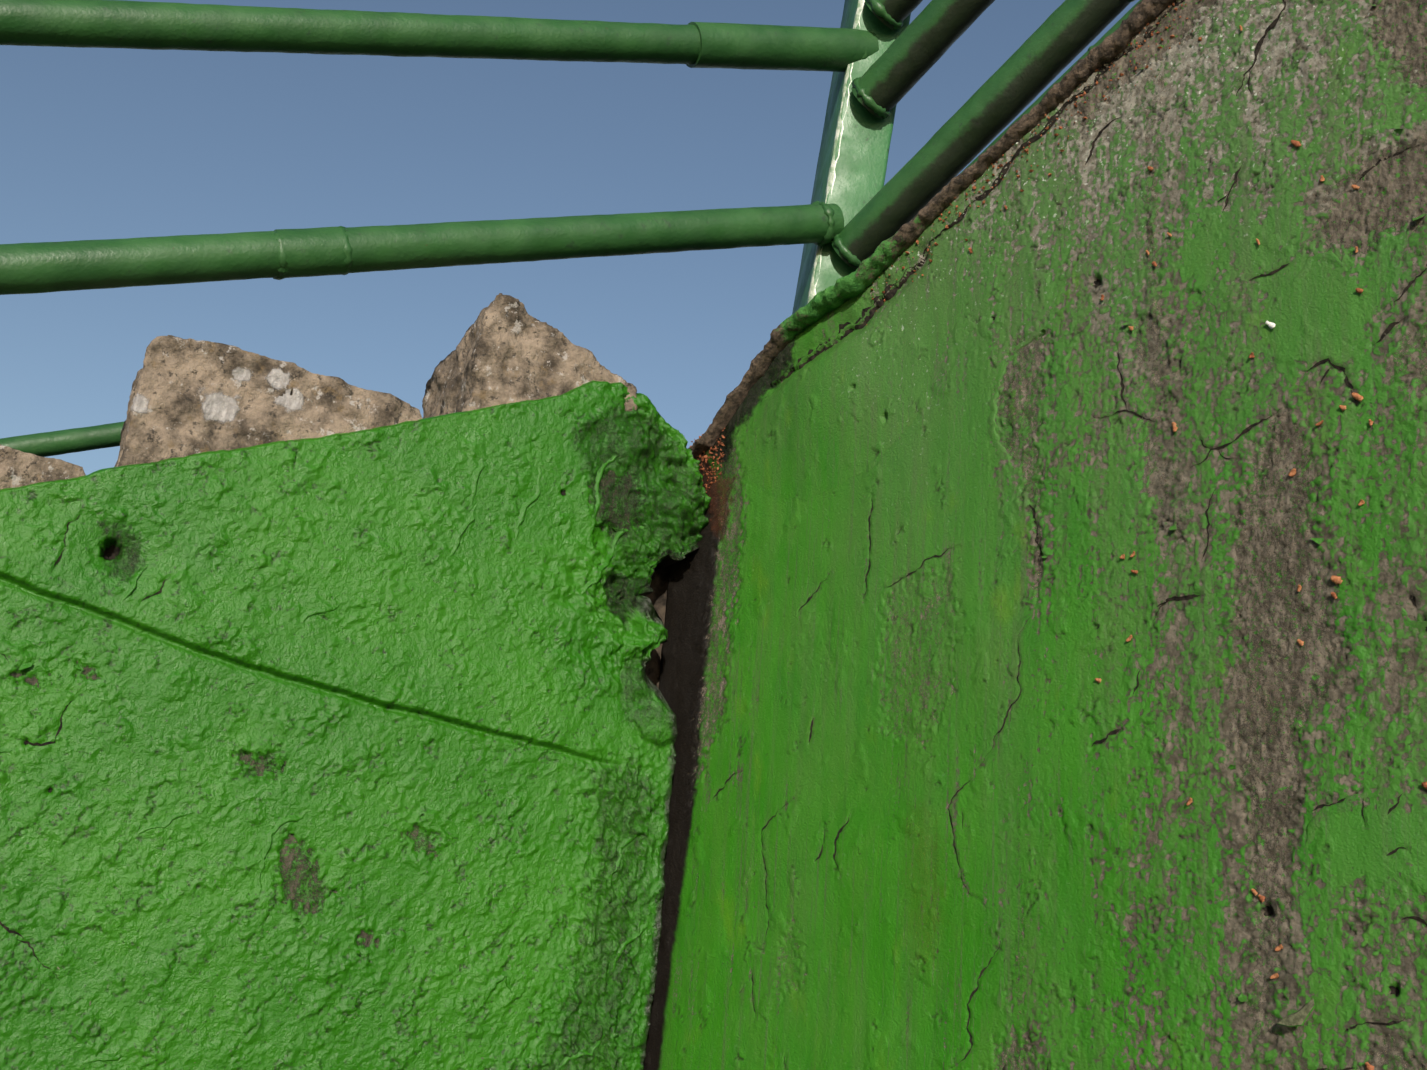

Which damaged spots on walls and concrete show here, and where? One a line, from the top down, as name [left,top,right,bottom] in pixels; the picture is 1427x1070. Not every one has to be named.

peeling [1067,0,1218,126]
peeling [1364,0,1427,89]
peeling [1306,128,1427,255]
crack [1375,264,1427,344]
crack [1102,344,1158,423]
crack [1309,358,1357,406]
peeling [998,321,1049,597]
crack [1190,408,1282,561]
crack [1153,594,1200,621]
crack [948,620,1028,899]
peeling [1227,405,1348,1068]
crack [949,941,1001,1069]